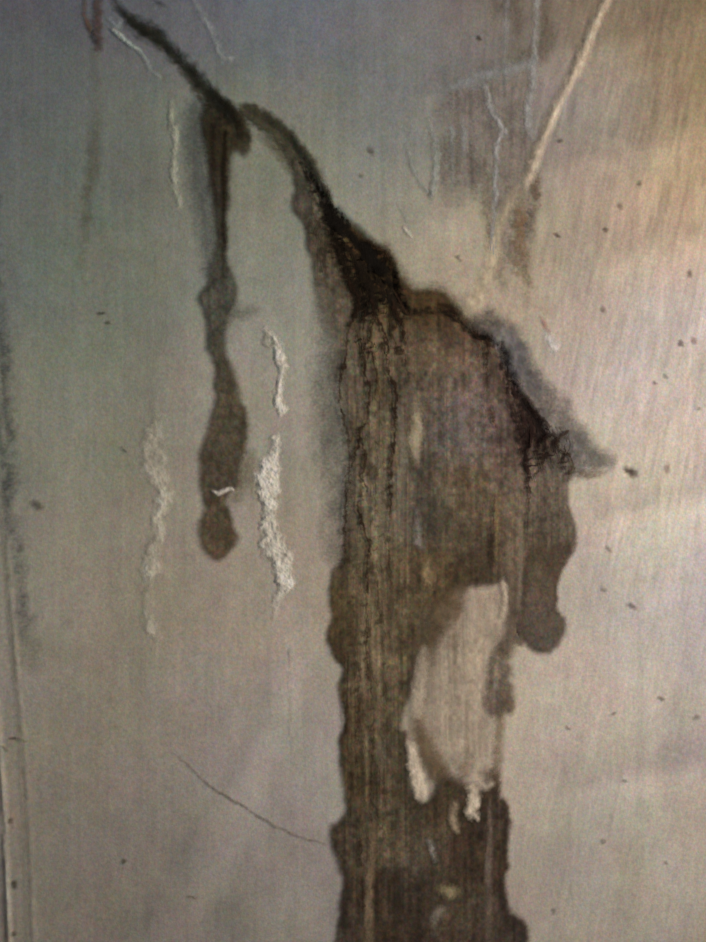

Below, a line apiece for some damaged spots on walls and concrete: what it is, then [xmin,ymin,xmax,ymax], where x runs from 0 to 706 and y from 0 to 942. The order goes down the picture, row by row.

efflorescence [143,426,173,589]
damp [169,94,294,608]
crack [118,7,601,774]
damp [292,151,607,942]
damp [487,93,506,154]